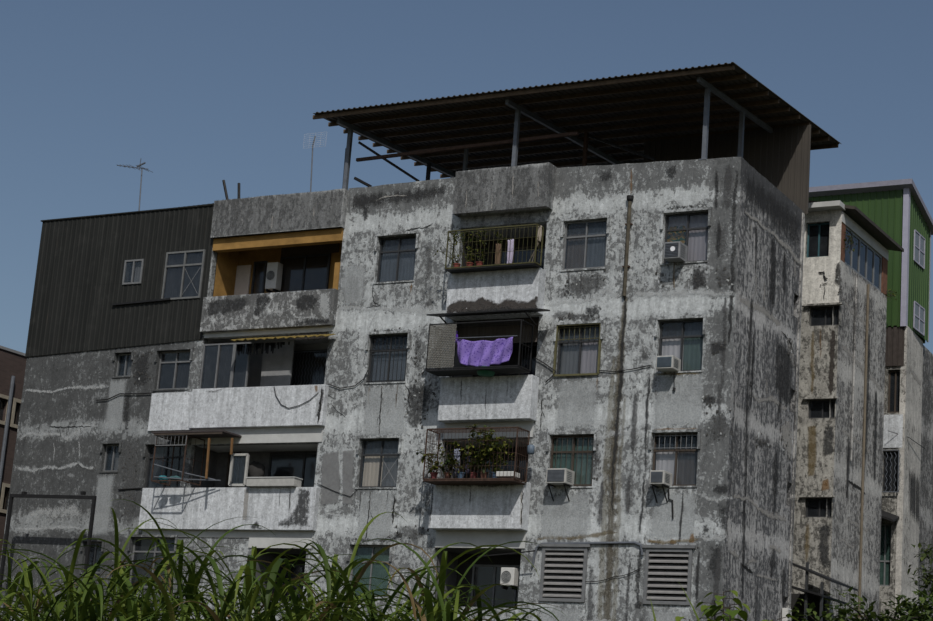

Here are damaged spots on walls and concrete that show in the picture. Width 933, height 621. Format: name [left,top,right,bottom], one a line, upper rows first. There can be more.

damp [353,187,446,220]
damp [207,296,271,316]
damp [291,244,538,340]
damp [551,166,801,621]
damp [18,424,95,474]
damp [279,489,310,526]